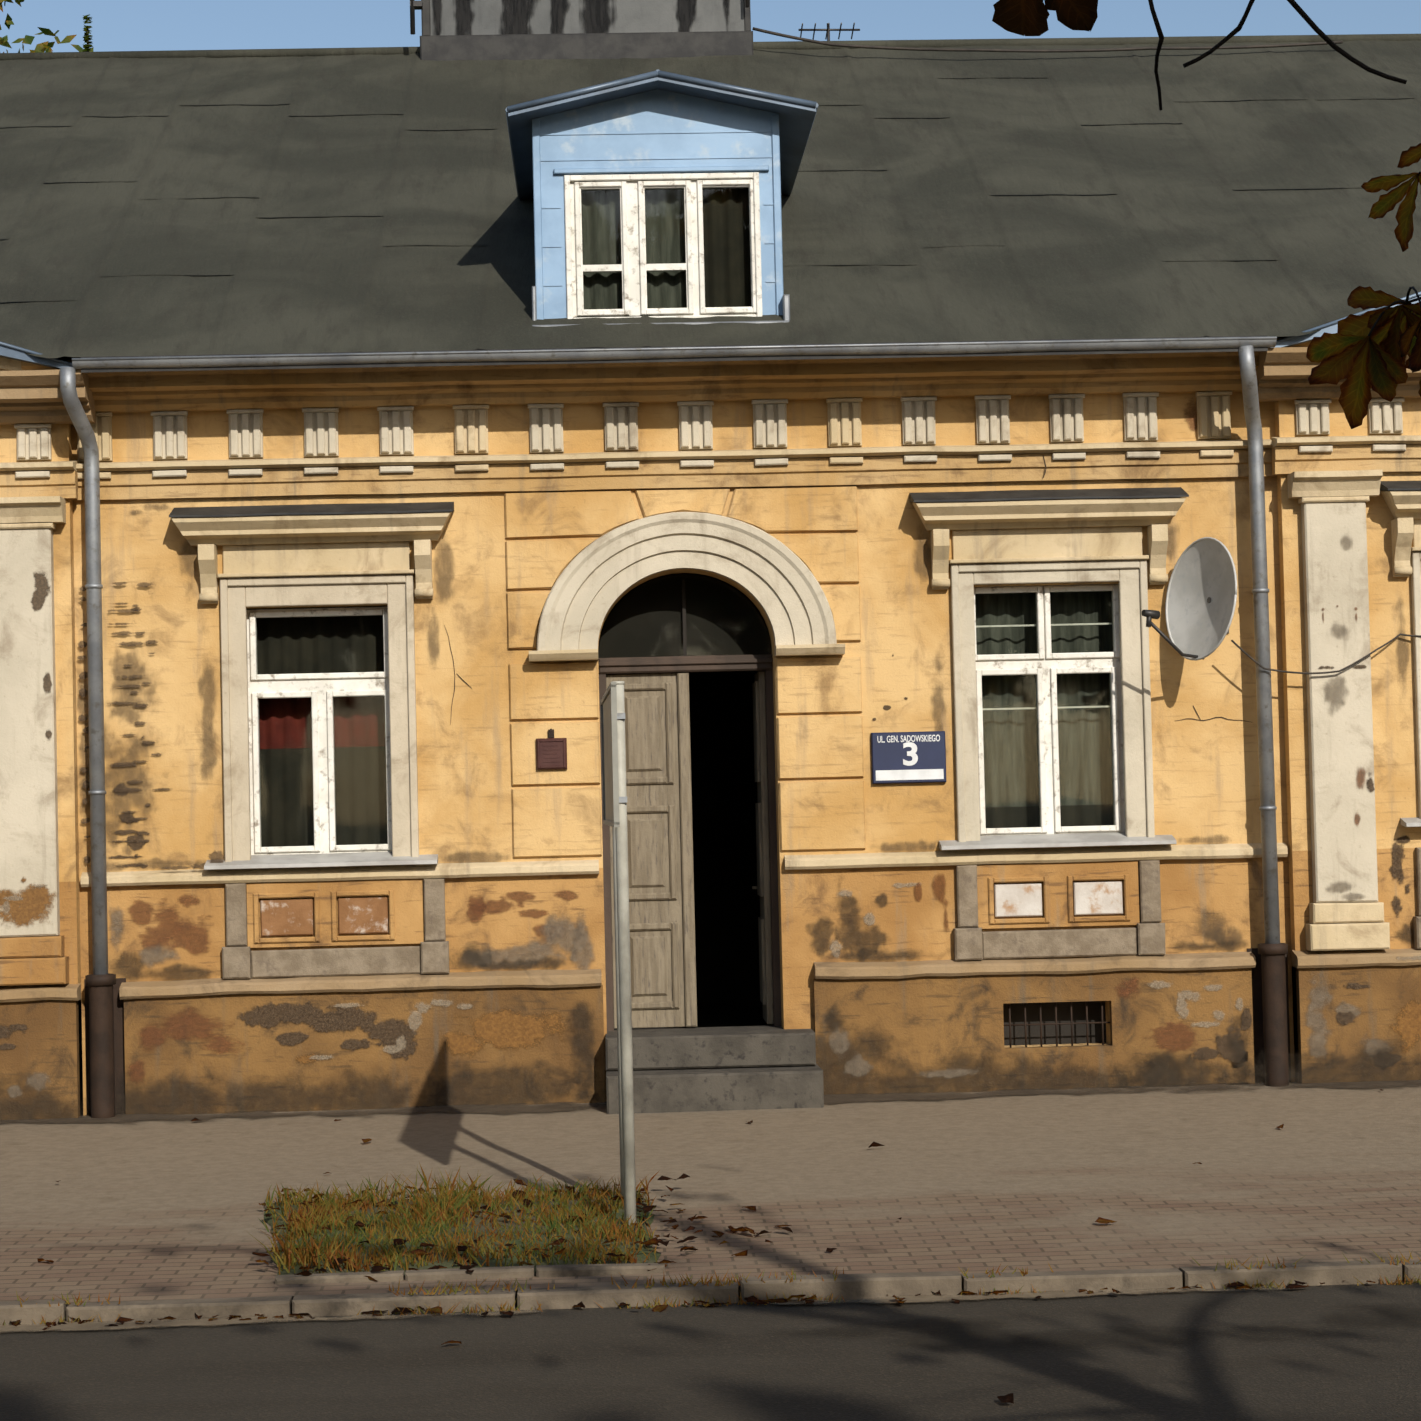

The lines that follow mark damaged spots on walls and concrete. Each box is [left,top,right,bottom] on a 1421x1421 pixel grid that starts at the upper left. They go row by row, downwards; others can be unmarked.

peeling [0,877,56,926]
flaking render [129,895,208,954]
flaking render [467,892,553,936]
flaking render [558,891,577,900]
spalling [237,1000,472,1060]